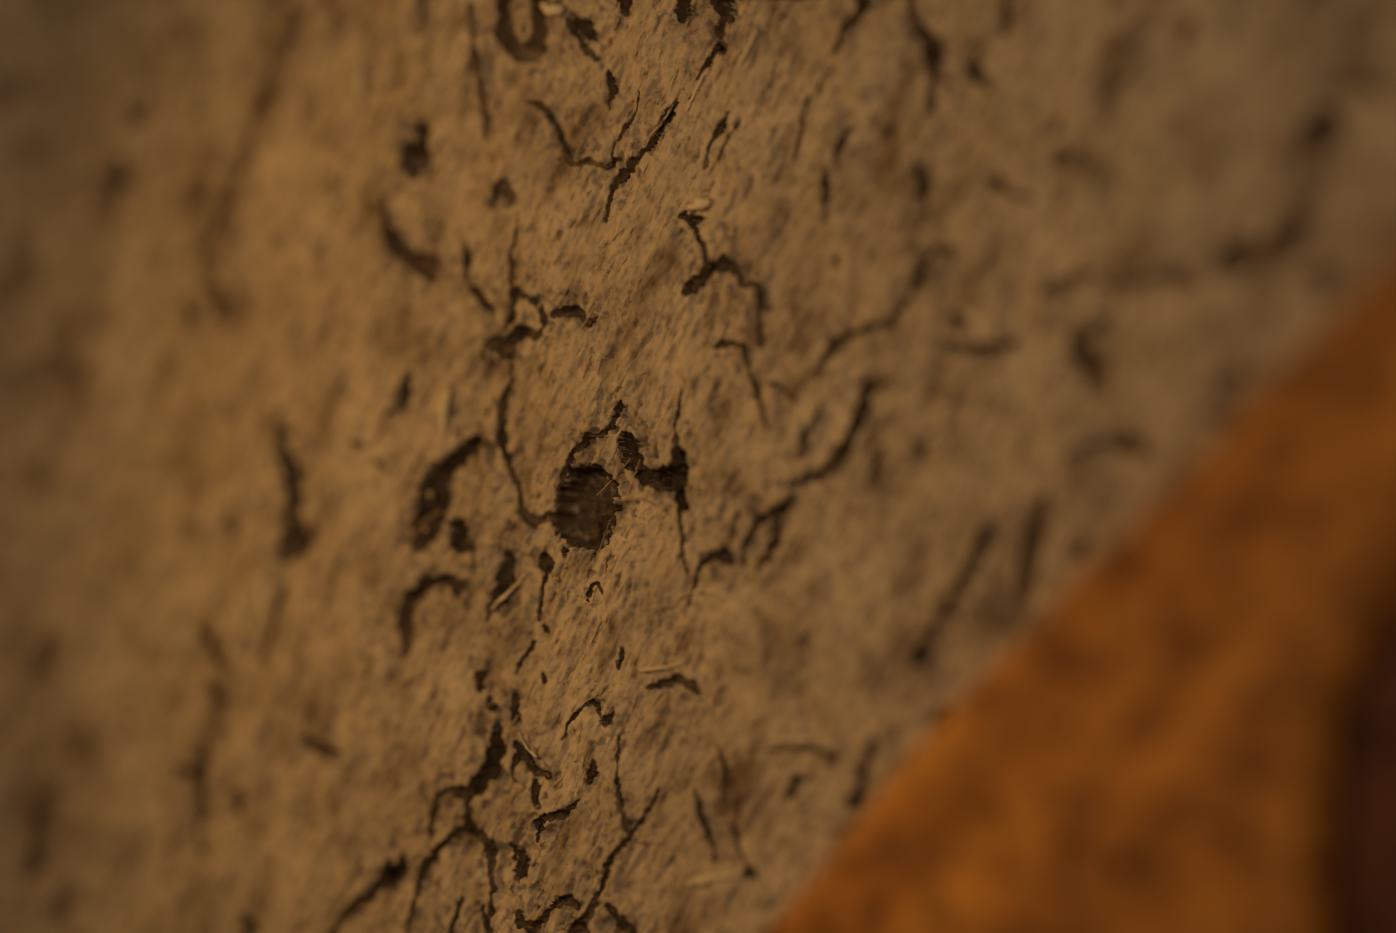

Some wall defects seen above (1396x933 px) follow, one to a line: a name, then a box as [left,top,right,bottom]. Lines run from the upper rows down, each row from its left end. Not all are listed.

crack [525,90,679,222]
crack [378,193,440,283]
crack [677,0,954,431]
crack [480,211,598,527]
crack [608,376,892,607]
crack [585,581,604,603]
crack [515,639,537,675]
crack [615,647,702,696]
crack [301,734,340,759]
crack [328,721,661,933]
crack [694,745,729,863]
crack [765,737,878,810]